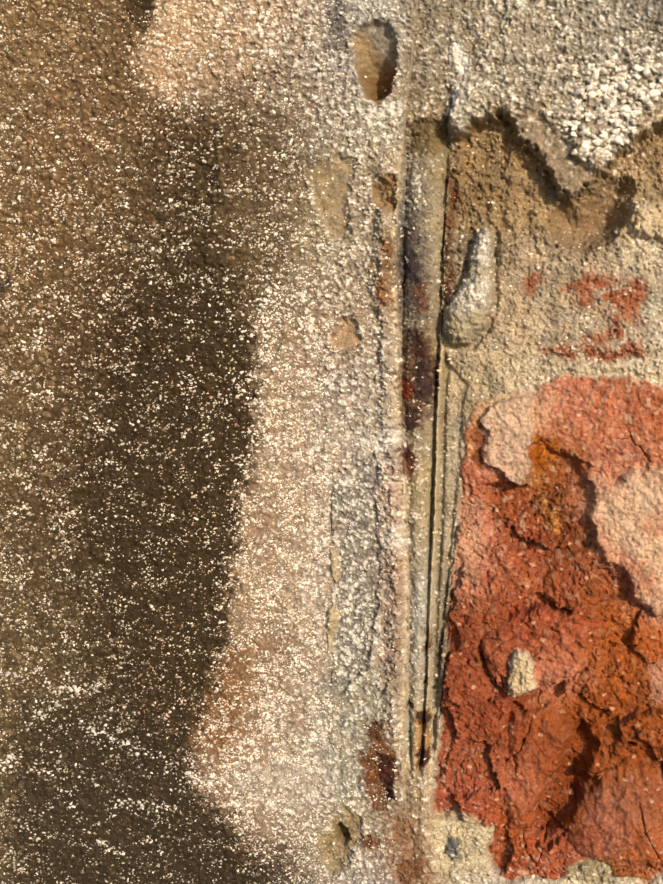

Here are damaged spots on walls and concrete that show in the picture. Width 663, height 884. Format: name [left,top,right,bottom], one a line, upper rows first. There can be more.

flaking render [353,22,398,105]
spalling [446,95,663,285]
rust [376,218,438,480]
damp [0,0,304,884]
spalling [480,397,598,556]
crack [482,651,505,693]
spalling [318,809,363,876]
rust [357,719,427,884]
crack [505,721,531,772]
crack [523,821,549,874]
spalling [533,721,597,831]
crack [639,803,659,866]